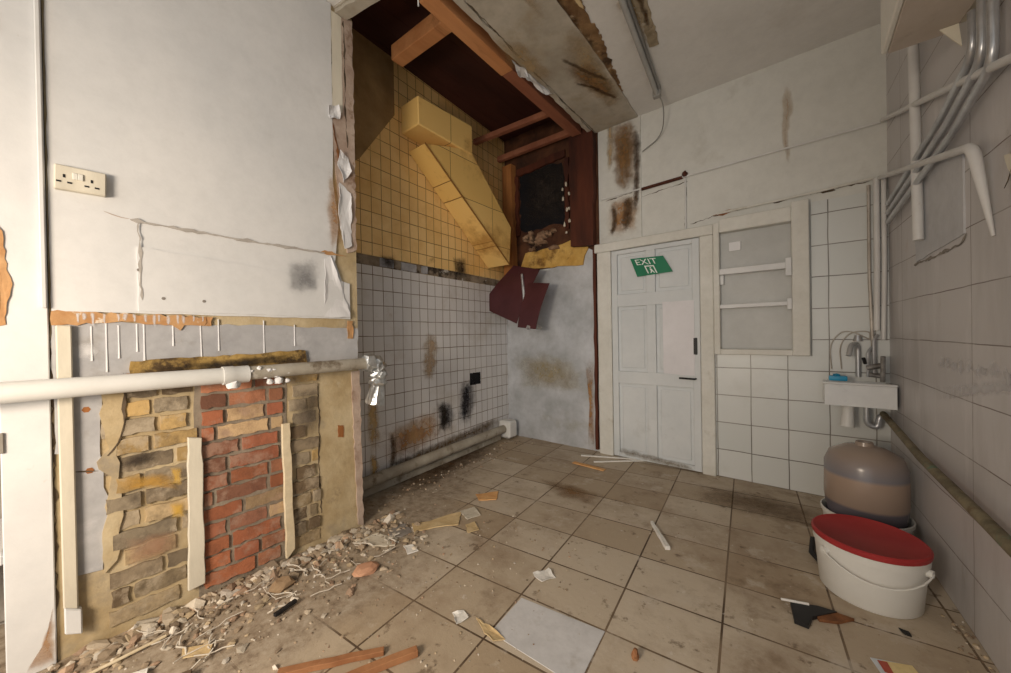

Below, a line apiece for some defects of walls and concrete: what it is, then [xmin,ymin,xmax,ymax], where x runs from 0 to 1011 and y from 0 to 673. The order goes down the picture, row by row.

flaking render [557,0,623,91]
flaking render [631,0,659,48]
peeling [512,60,567,109]
flaking render [328,10,499,286]
flaking render [522,182,571,252]
peeling [0,229,13,326]
peeling [50,310,213,330]
peeling [324,256,354,339]
water stain [424,340,435,376]
water stain [440,387,473,429]
flaking render [82,374,321,628]